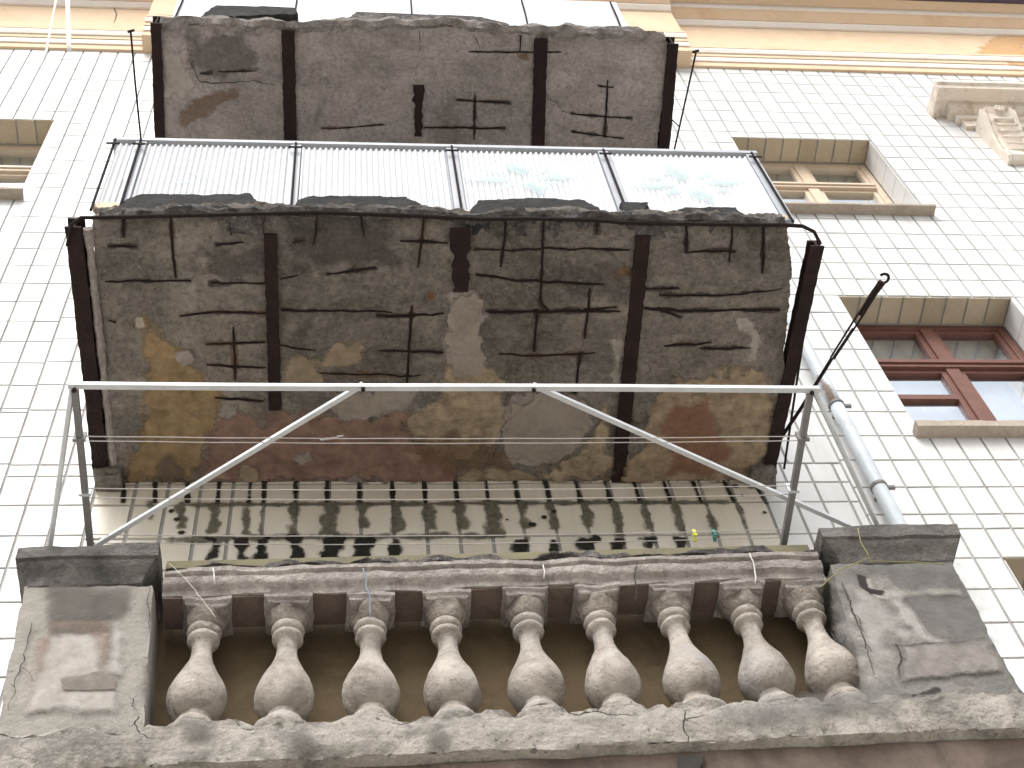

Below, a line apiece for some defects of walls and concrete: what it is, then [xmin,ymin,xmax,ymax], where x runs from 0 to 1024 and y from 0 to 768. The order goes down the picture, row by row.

spalling [159,14,665,53]
spalling [424,94,511,140]
spalling [571,80,633,139]
peeling [65,202,822,484]
damp [147,482,158,519]
damp [169,402,769,560]
crack [842,581,979,678]
crack [8,623,32,709]
crack [131,695,164,739]
crack [682,711,705,742]